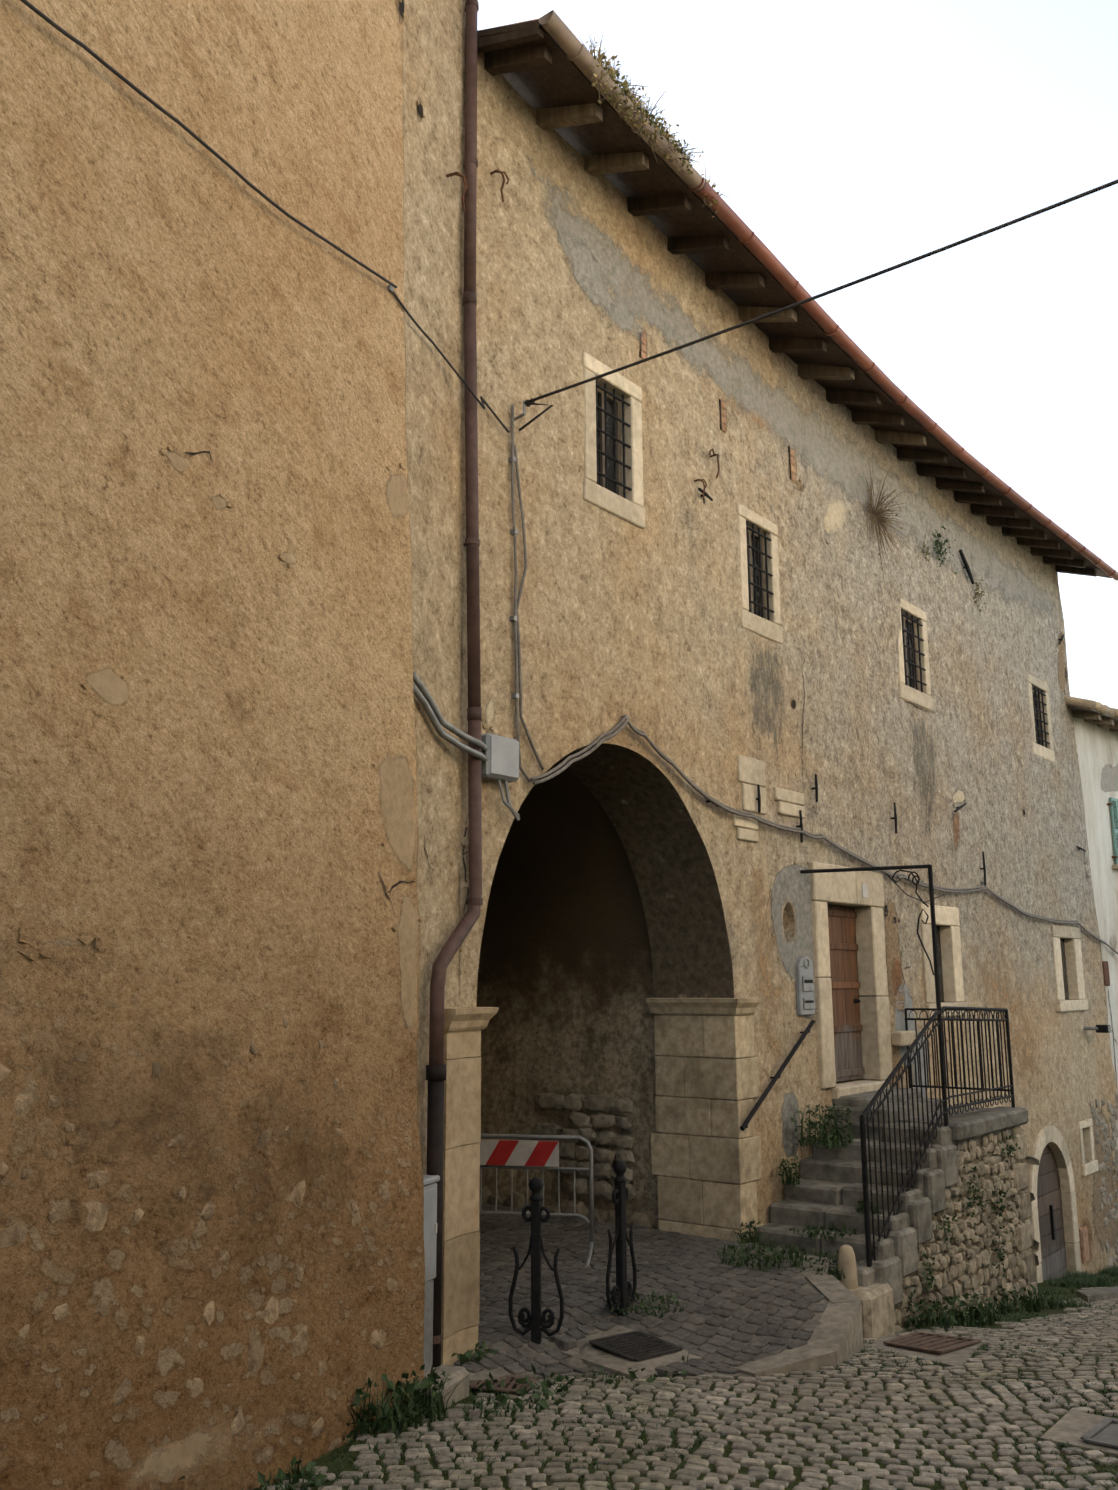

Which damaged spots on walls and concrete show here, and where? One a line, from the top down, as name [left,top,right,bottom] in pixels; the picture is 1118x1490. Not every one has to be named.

damp [751,651,784,751]
damp [913,723,935,831]
flaking render [1101,764,1118,792]
flaking render [14,1084,76,1133]
flaking render [84,1170,109,1232]
flaking render [289,1180,305,1204]
flaking render [51,1303,70,1321]
flaking render [203,1301,215,1326]
flaking render [247,1296,279,1375]